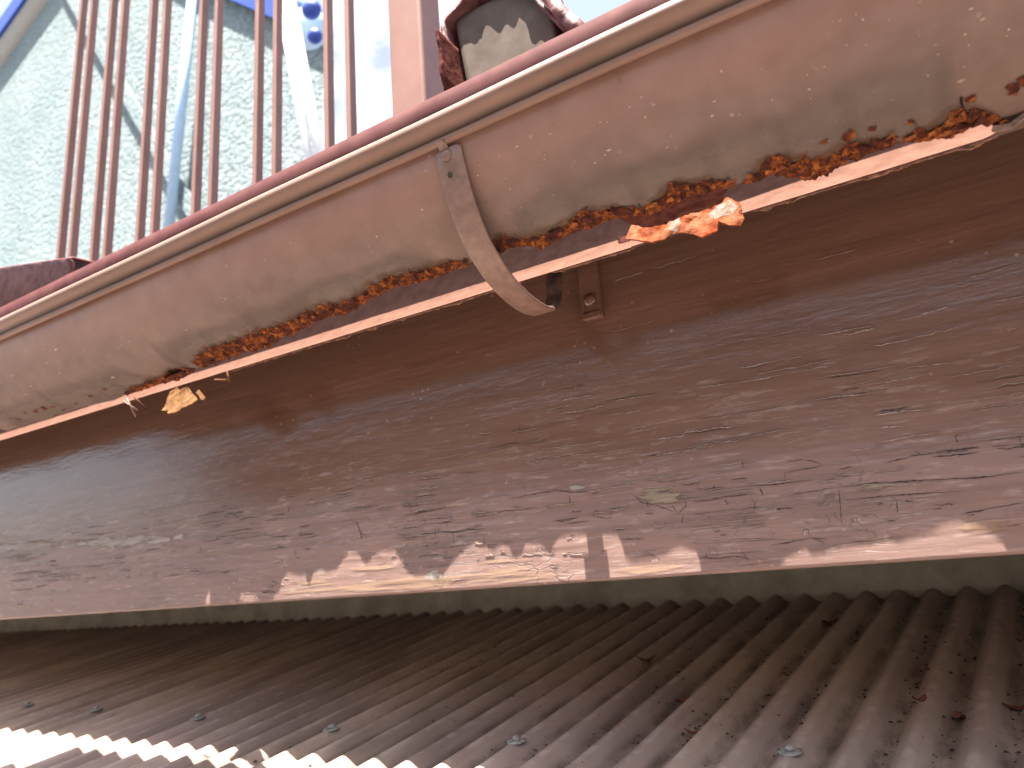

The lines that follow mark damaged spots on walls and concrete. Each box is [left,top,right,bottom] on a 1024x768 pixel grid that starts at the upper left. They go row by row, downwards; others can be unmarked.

peeling [617,187,744,244]
rust [492,95,1009,255]
rust [124,258,470,395]
crack [0,258,1024,606]